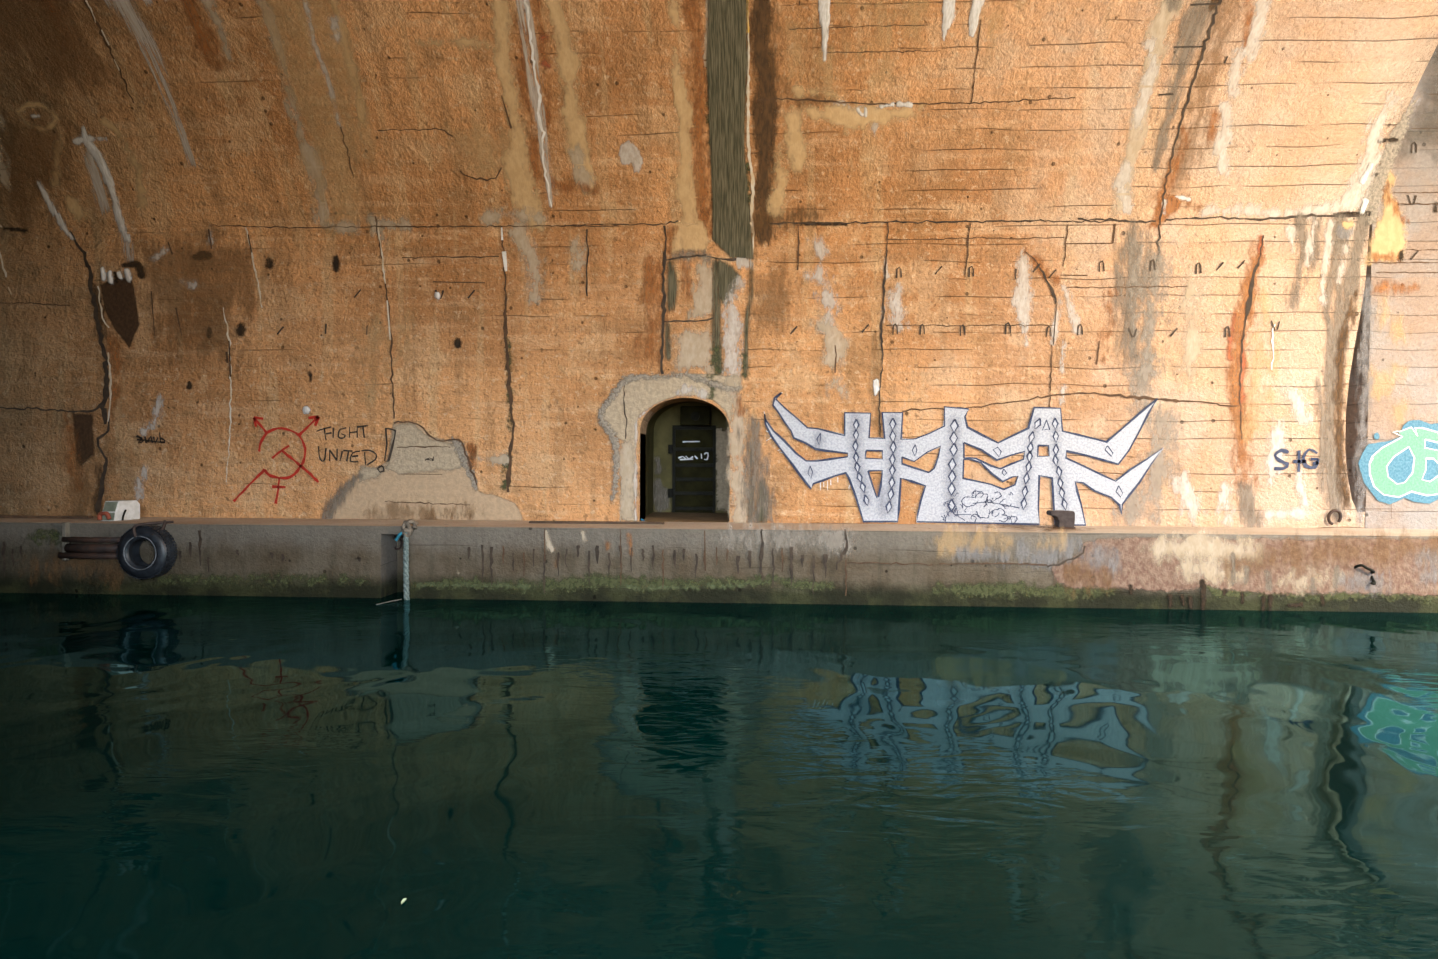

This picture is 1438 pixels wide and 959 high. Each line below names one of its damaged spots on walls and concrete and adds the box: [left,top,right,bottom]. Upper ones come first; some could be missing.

crack [0,225,121,515]
water stain [0,102,148,262]
spalling [322,421,522,521]
crack [215,207,714,492]
spalling [598,371,742,521]
water stain [667,0,773,523]
water stain [749,0,1075,246]
water stain [1012,250,1080,346]
crack [770,0,1438,437]
water stain [1107,0,1219,526]
water stain [1207,0,1272,176]
corrosion [1227,235,1264,527]